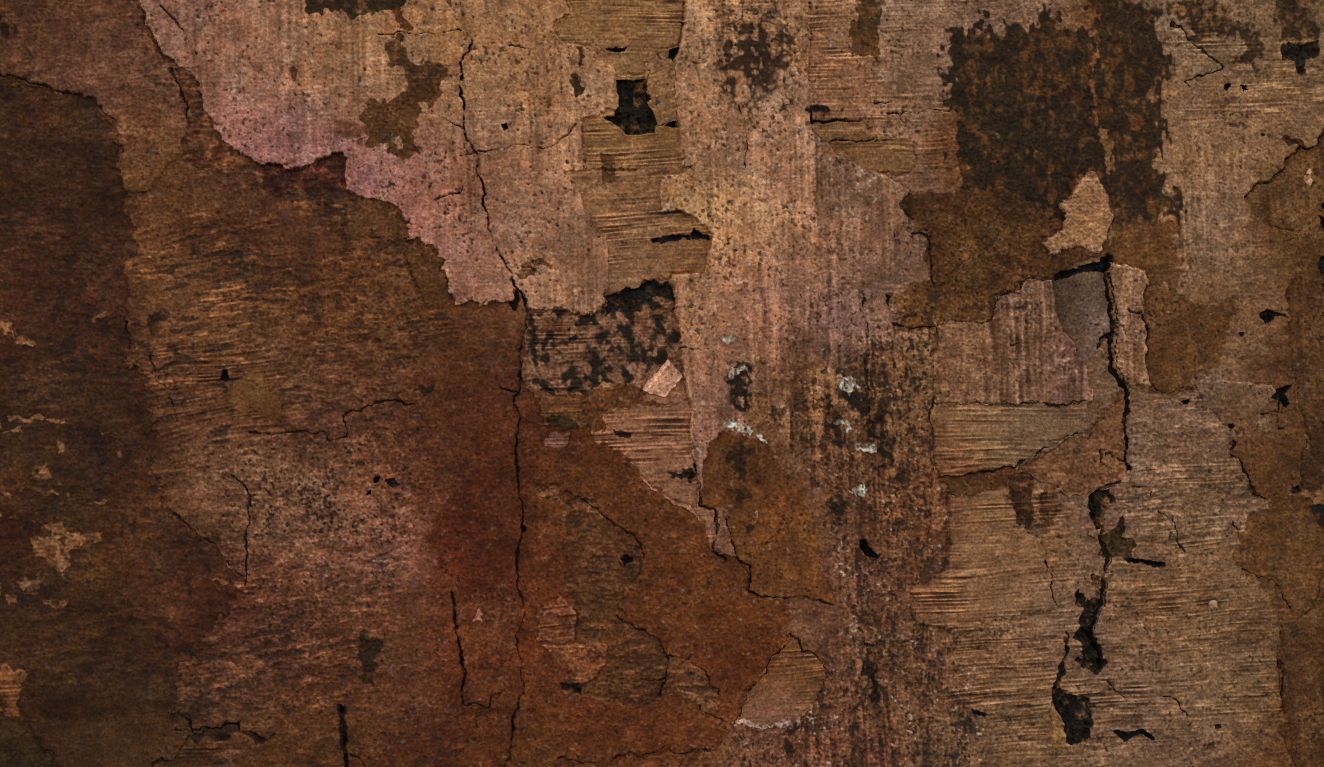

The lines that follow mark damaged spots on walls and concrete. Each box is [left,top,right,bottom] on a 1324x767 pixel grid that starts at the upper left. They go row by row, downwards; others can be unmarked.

damp [937,0,1265,292]
crack [1244,129,1324,198]
spalling [0,0,834,767]
flaking render [553,0,1324,632]
crack [862,254,1197,698]
spalling [1045,574,1109,751]
spalling [1276,564,1324,767]